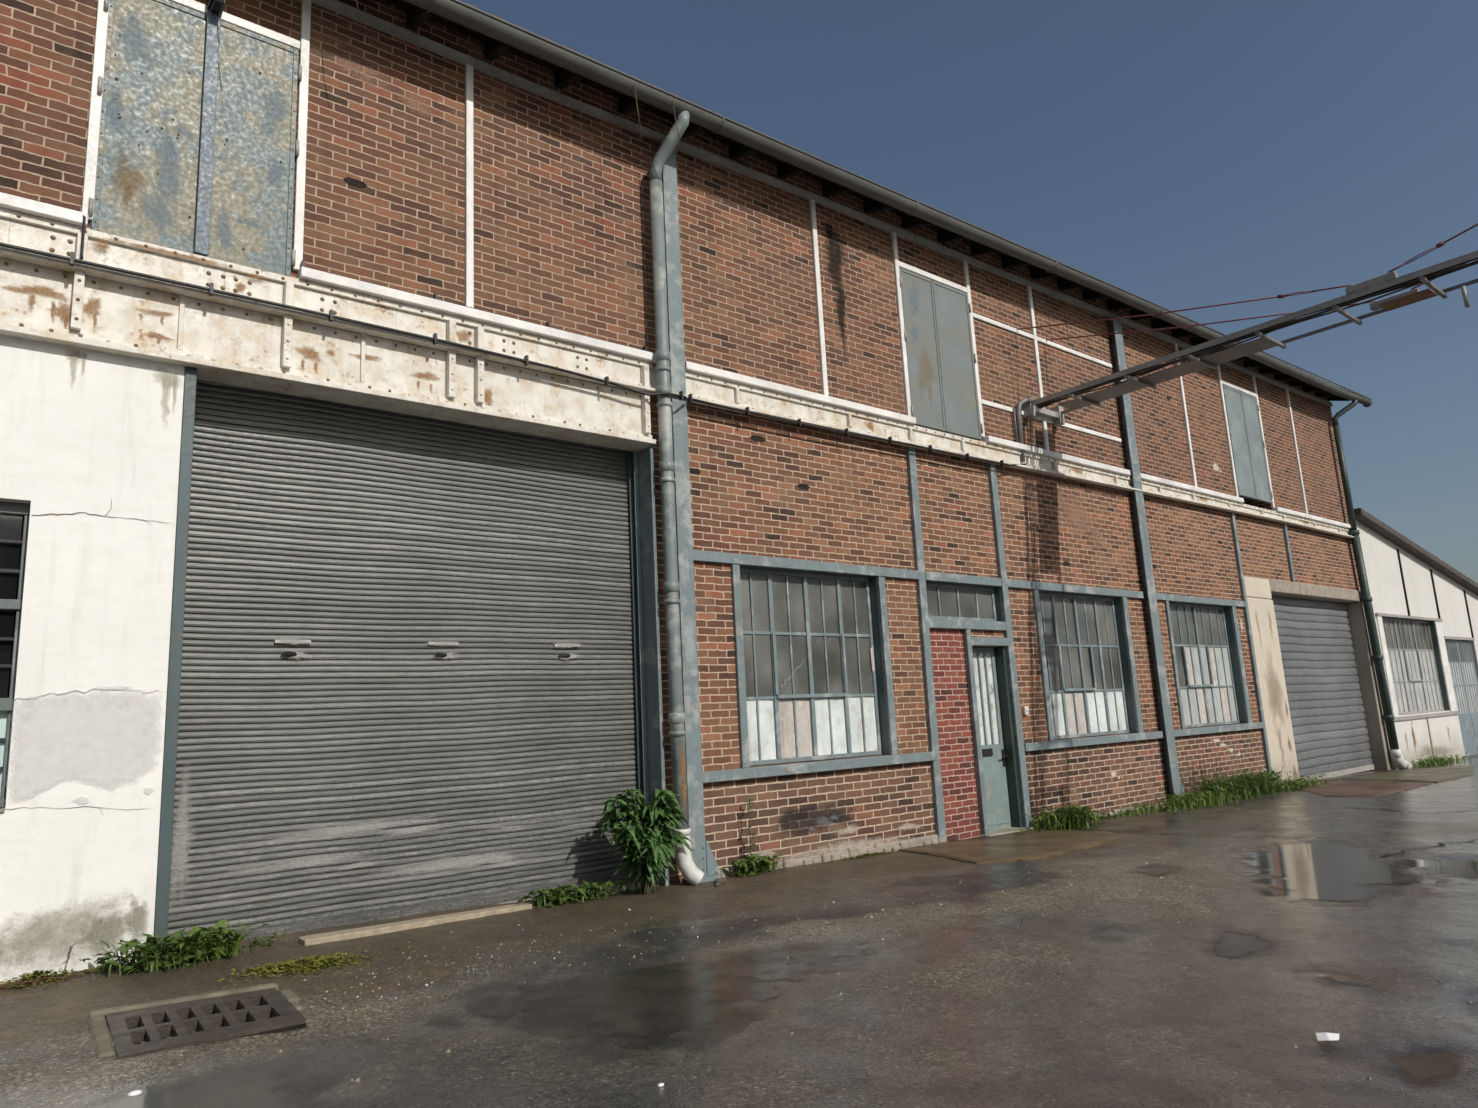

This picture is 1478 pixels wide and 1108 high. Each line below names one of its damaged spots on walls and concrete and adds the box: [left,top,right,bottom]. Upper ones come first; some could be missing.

corrosion [94,239,216,264]
damp [829,231,844,333]
corrosion [4,286,99,328]
corrosion [139,310,171,343]
corrosion [297,348,334,372]
corrosion [416,372,436,391]
crack [36,500,165,523]
crack [1350,807,1478,881]
damp [0,902,146,963]